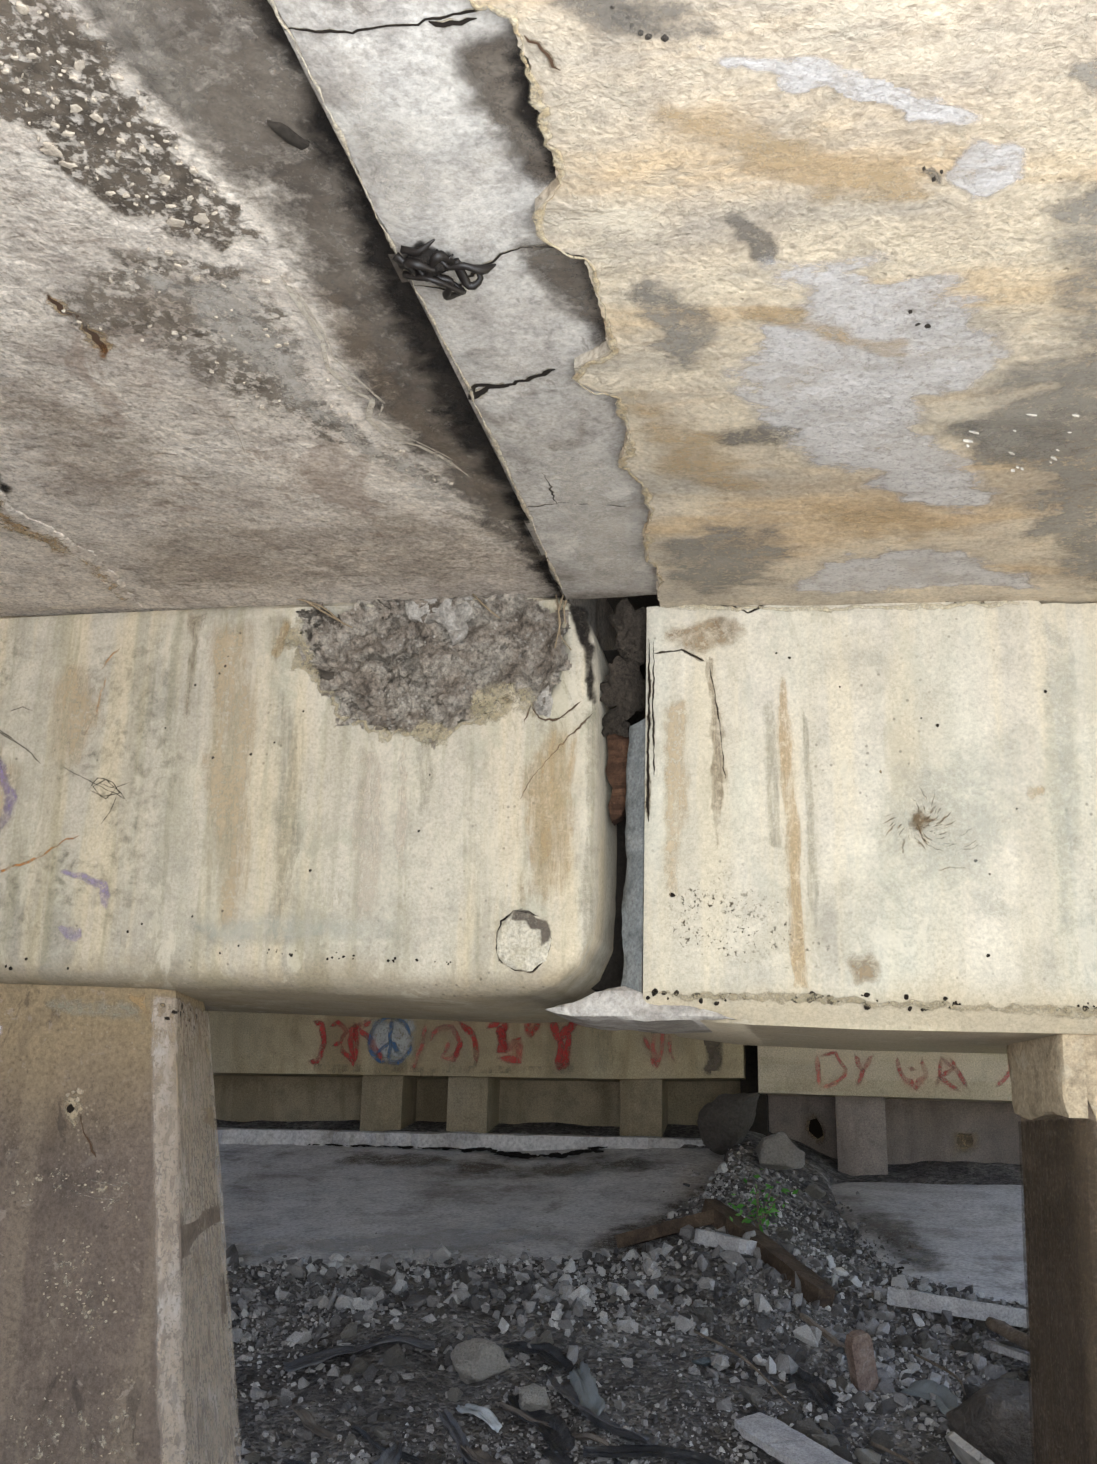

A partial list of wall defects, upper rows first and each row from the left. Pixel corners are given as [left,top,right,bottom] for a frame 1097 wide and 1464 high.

crack [284,8,478,34]
peeling [0,0,453,505]
damp [120,0,566,601]
damp [524,245,606,344]
spalling [267,0,572,749]
crack [468,368,555,400]
spalling [0,475,128,600]
spalling [545,986,745,1034]